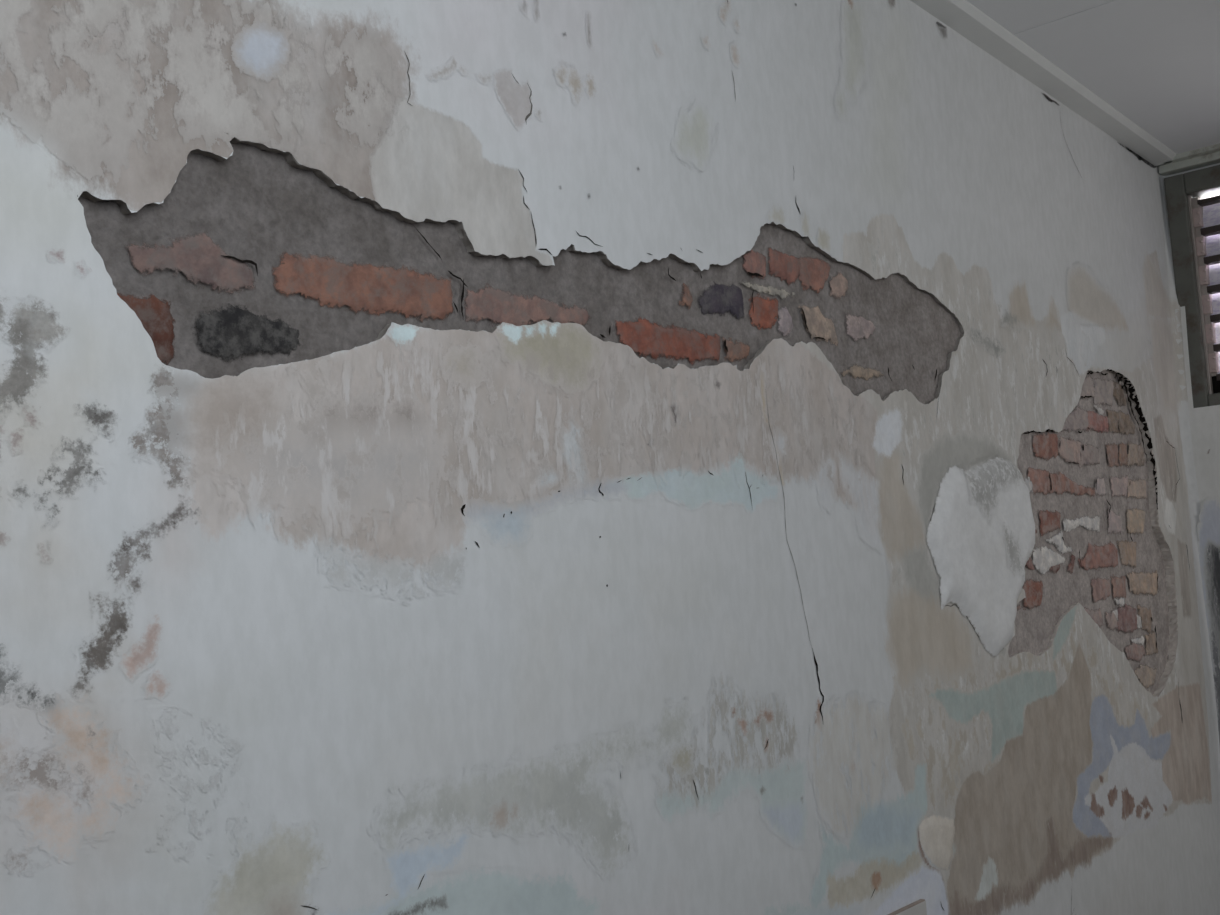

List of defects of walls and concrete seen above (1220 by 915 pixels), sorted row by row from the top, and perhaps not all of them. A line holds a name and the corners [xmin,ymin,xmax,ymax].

leakage [0,287,73,418]
leakage [0,0,410,197]
spalling [0,0,964,404]
peeling [1007,263,1082,335]
flaking render [1114,139,1157,169]
leakage [0,363,470,833]
leakage [522,465,633,520]
crack [766,397,824,720]
peeling [876,446,977,698]
spalling [1008,369,1212,806]
leakage [1205,543,1220,743]
flaking render [919,641,1093,908]